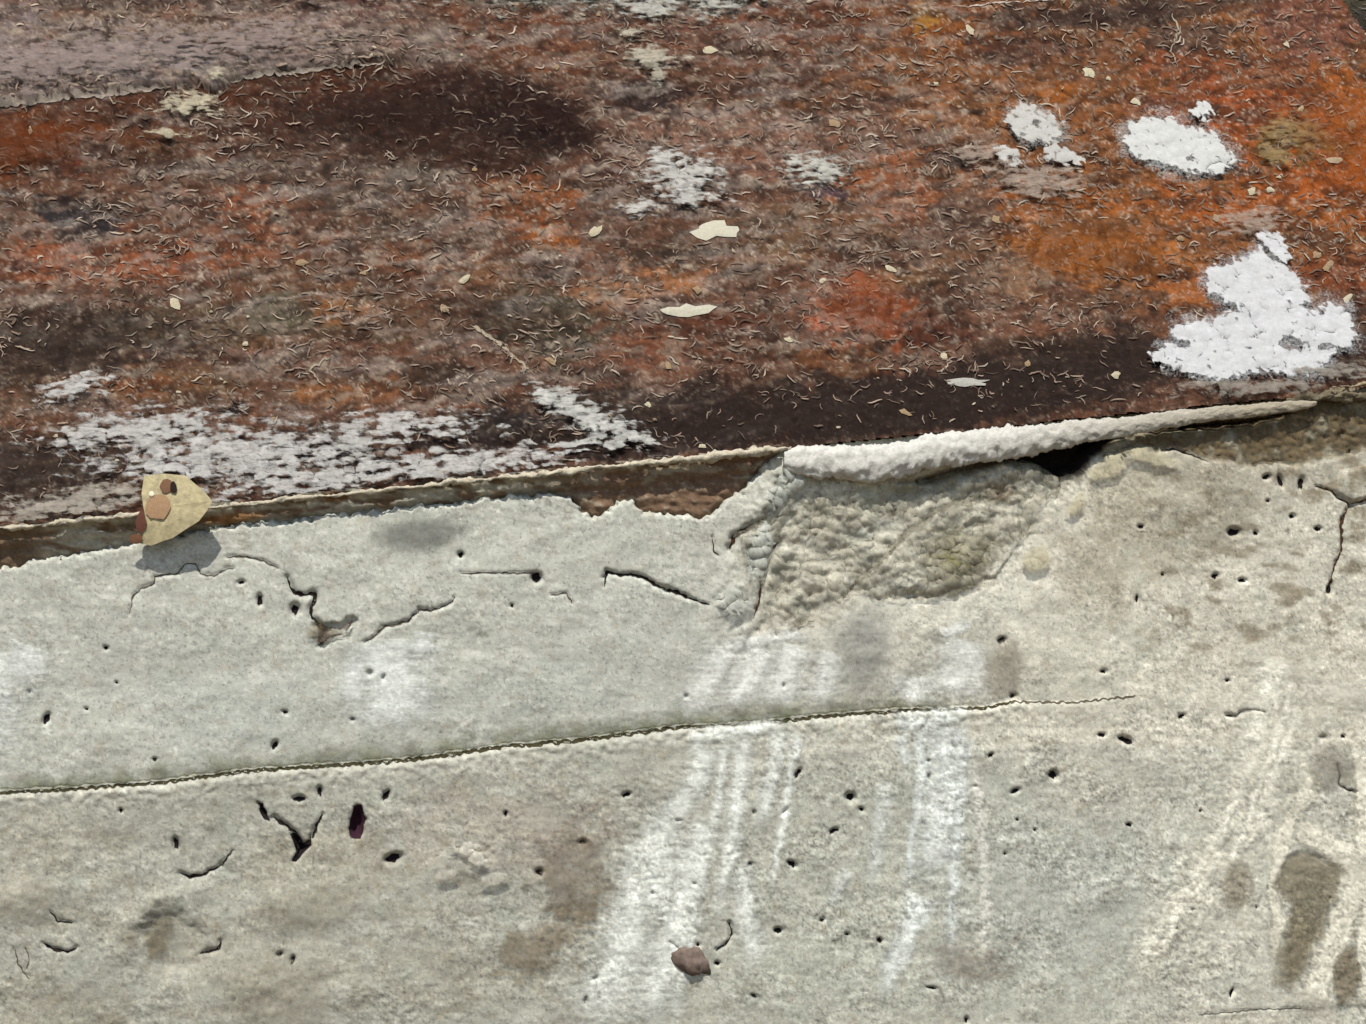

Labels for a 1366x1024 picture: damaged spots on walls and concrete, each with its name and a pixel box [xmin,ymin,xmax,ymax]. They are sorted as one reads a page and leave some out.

crack [1315,486,1366,594]
crack [129,555,322,646]
crack [366,572,572,641]
crack [604,570,710,605]
damp [684,618,883,712]
crack [0,695,1136,794]
crack [181,851,232,878]
crack [274,814,323,853]
damp [585,722,802,1016]
damp [870,783,893,873]
damp [880,621,1020,988]
damp [1131,657,1366,1006]